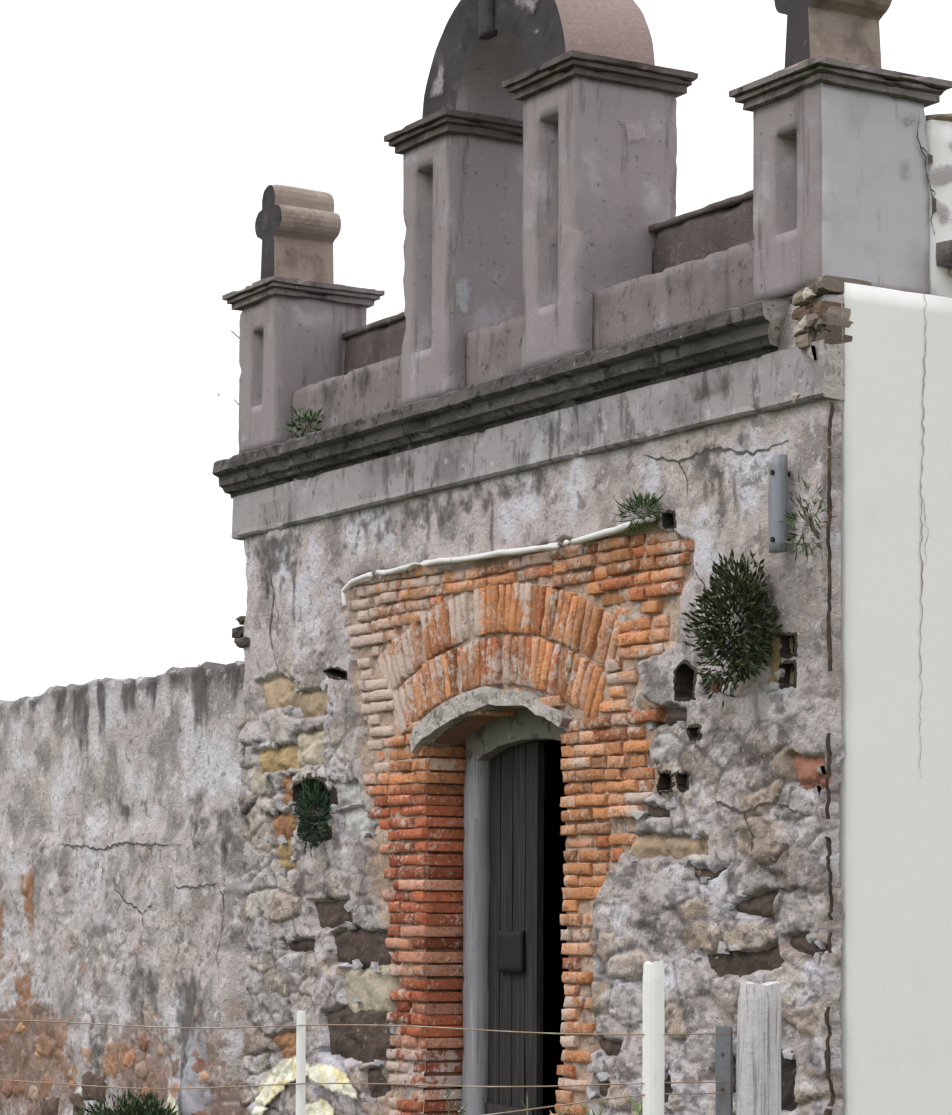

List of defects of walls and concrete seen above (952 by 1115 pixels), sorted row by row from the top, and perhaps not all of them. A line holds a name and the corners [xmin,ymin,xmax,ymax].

spalling [792,275,872,360]
water stain [255,535,299,619]
water stain [405,473,545,539]
crack [643,440,788,501]
spalling [826,402,834,671]
water stain [56,679,104,745]
water stain [121,672,174,713]
water stain [191,664,207,731]
flaking render [252,531,727,1115]
crack [57,841,224,985]
spalling [691,837,834,977]
spalling [781,1047,798,1111]